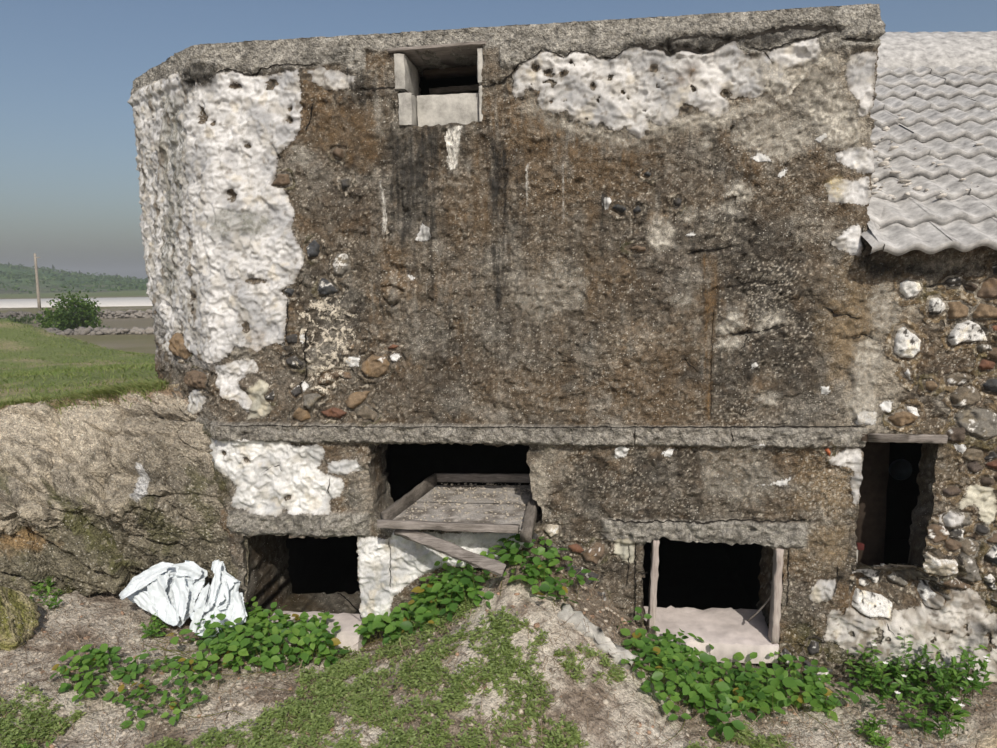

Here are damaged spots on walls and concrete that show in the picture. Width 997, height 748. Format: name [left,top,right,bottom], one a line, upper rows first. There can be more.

peeling [512,37,821,138]
crack [478,24,876,87]
peeling [845,51,879,116]
leakage [380,126,462,244]
leakage [490,139,517,212]
peeling [823,146,875,206]
peeling [127,66,406,432]
peeling [415,223,431,241]
leakage [493,246,501,307]
peeling [829,225,863,256]
peeling [209,437,364,517]
peeling [357,519,636,617]